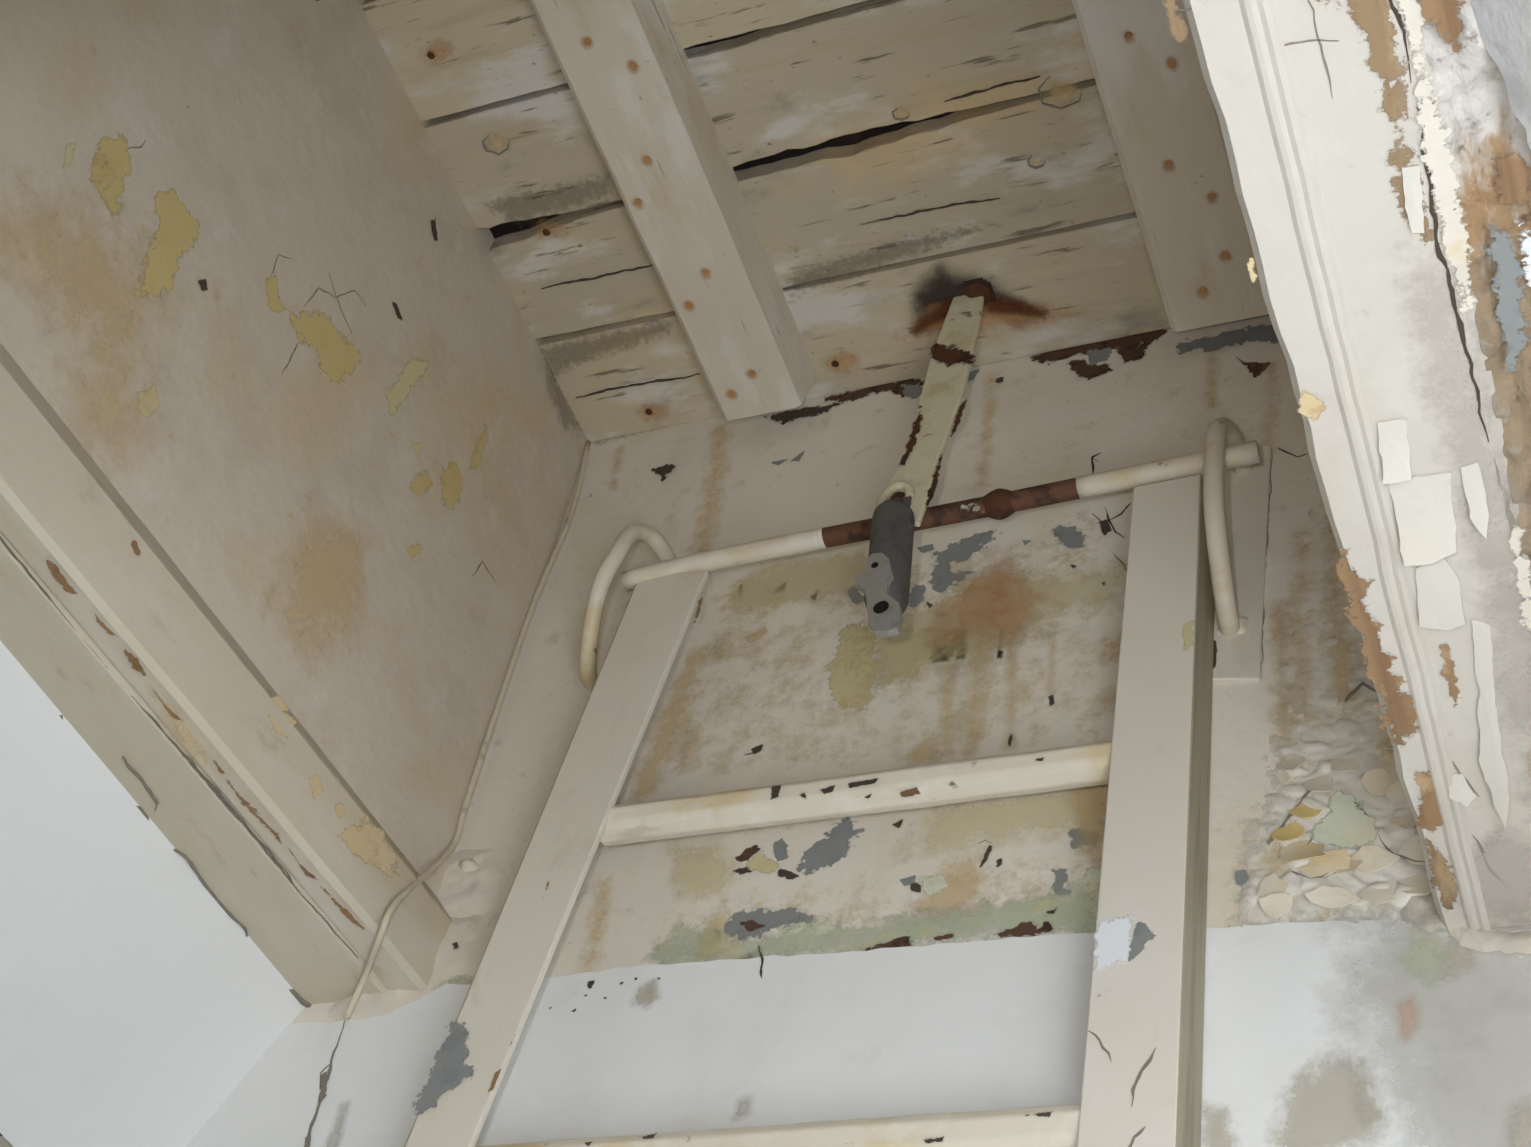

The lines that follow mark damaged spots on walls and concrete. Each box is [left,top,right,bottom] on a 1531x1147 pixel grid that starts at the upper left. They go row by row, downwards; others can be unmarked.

rust [913,270,1045,367]
spalling [1317,0,1531,631]
crack [1389,0,1531,622]
rust [925,454,943,508]
peeling [909,531,995,608]
peeling [1051,518,1111,569]
peeling [1235,419,1510,925]
peeling [733,817,865,880]
peeling [921,866,1101,933]
peeling [655,907,842,974]
crack [289,989,312,1008]
crack [304,1020,345,1147]